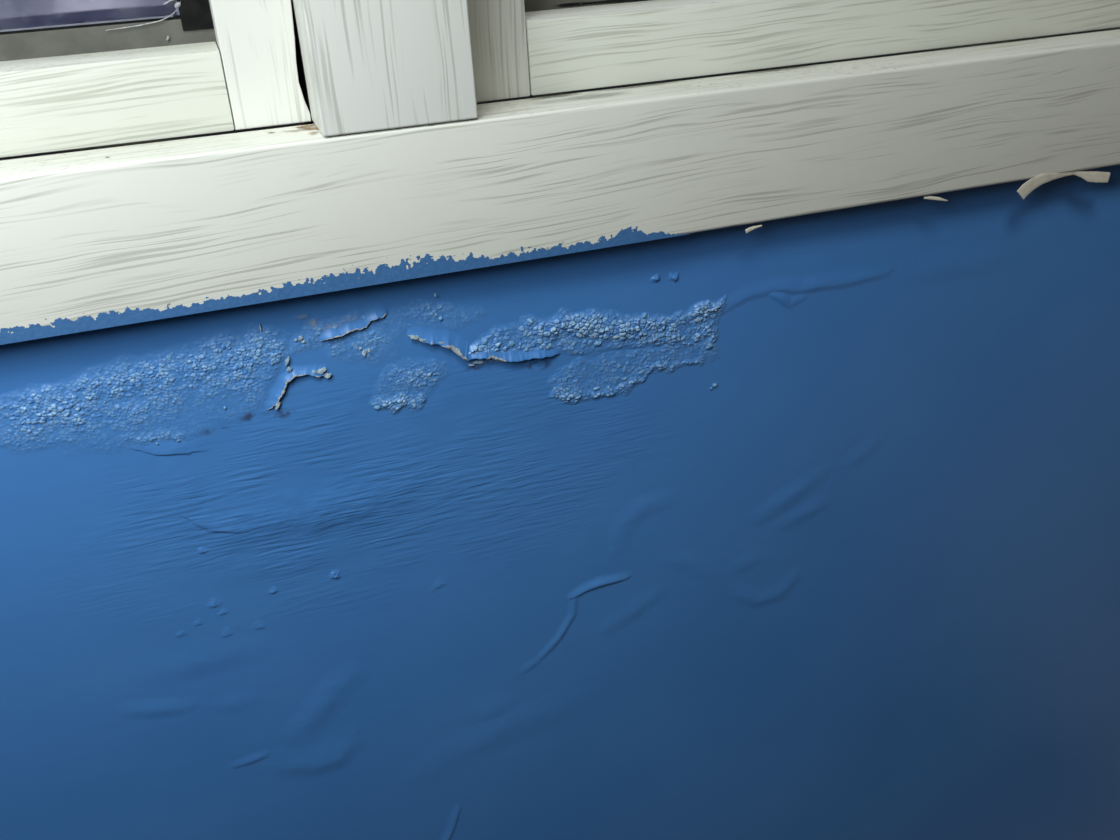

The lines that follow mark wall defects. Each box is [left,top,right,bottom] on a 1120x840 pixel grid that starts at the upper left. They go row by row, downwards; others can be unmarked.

peeling [319,302,388,356]
peeling [407,313,560,366]
peeling [264,356,332,410]